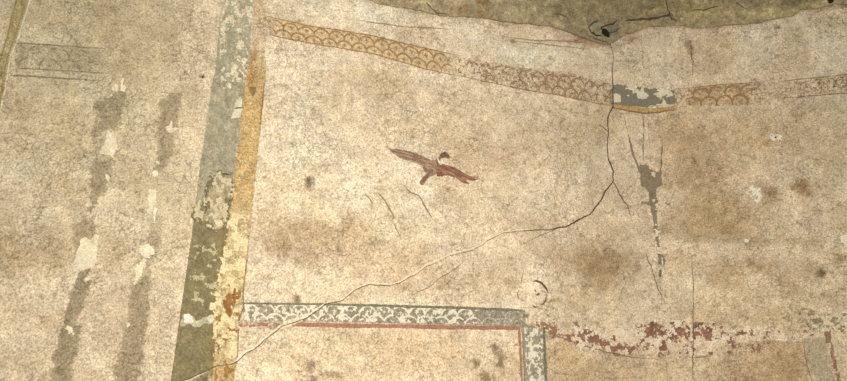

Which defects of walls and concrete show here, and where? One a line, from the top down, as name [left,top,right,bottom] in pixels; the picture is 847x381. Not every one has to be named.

peeling [614,87,673,106]
spalling [180,170,303,360]
crack [182,43,633,381]
peeling [536,320,780,358]